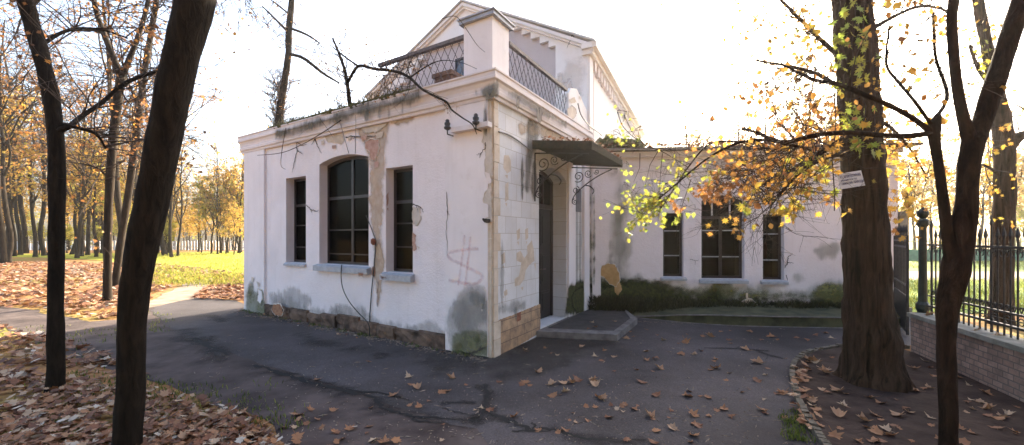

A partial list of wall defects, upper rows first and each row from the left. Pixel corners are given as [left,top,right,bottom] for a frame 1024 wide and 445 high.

peeling [501,228,536,297]
peeling [601,263,622,295]